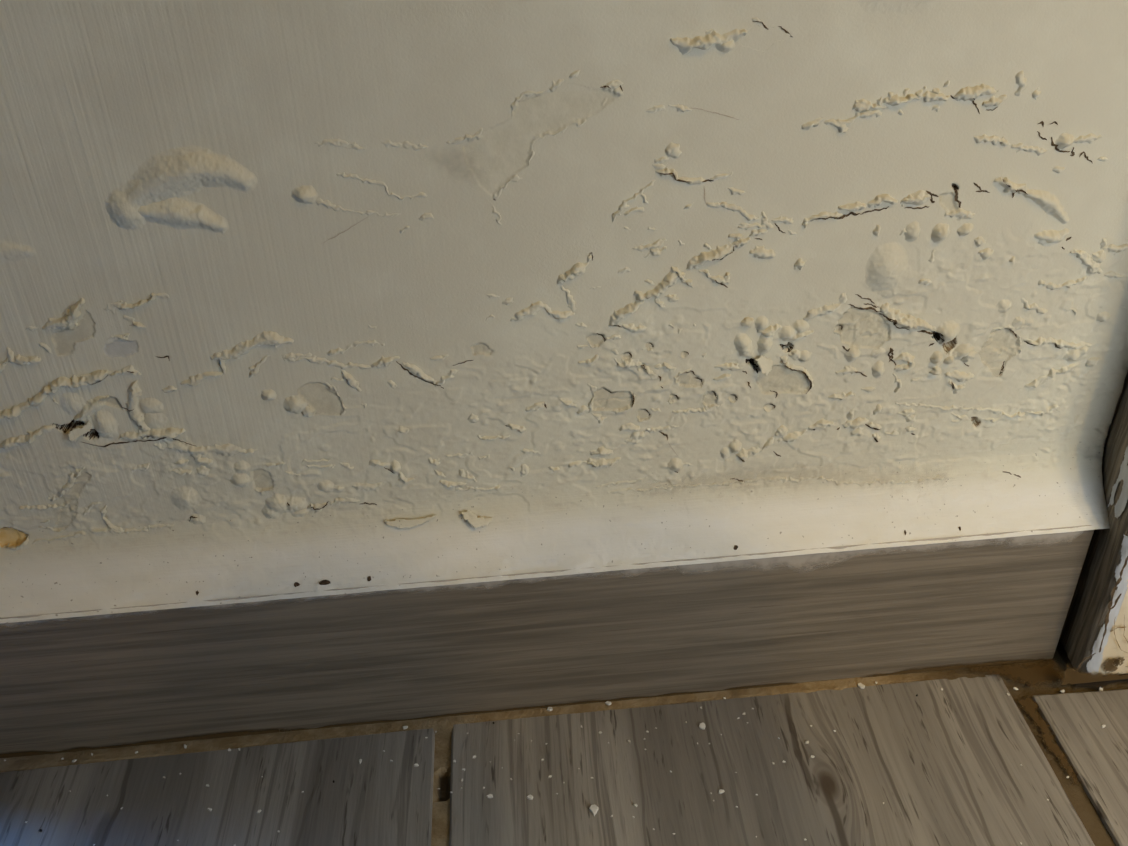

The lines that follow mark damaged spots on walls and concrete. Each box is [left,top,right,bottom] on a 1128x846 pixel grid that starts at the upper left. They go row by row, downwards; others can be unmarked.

peeling [974,121,1108,173]
peeling [486,142,975,423]
peeling [974,177,1128,290]
peeling [0,292,169,420]
peeling [979,325,1100,392]
peeling [1108,447,1128,519]
crack [1078,532,1128,669]
peeling [1086,535,1128,674]